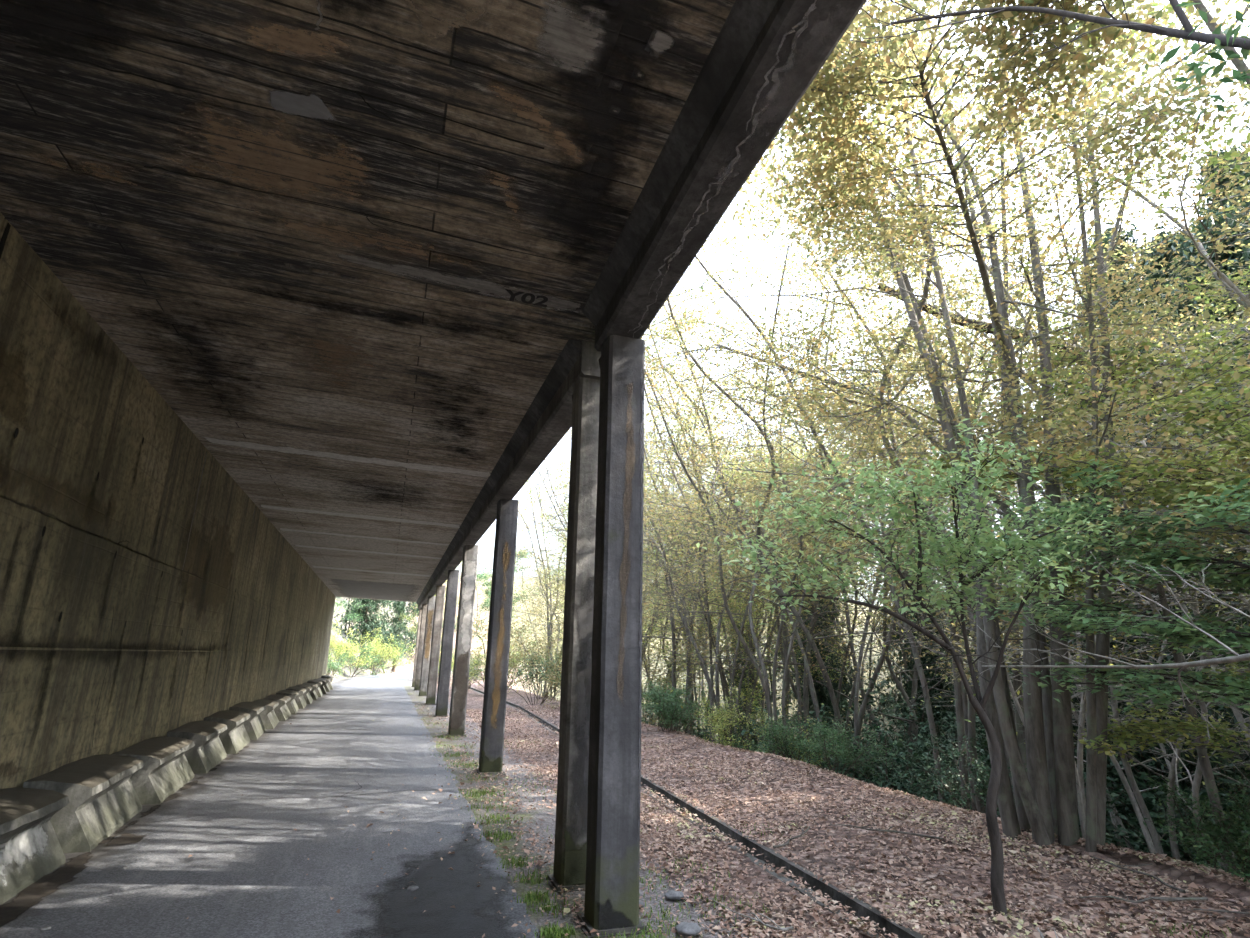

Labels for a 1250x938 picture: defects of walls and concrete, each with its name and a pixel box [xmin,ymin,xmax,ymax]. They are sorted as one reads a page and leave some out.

peeling [161,105,391,214]
crack [629,0,817,338]
rust [617,383,635,698]